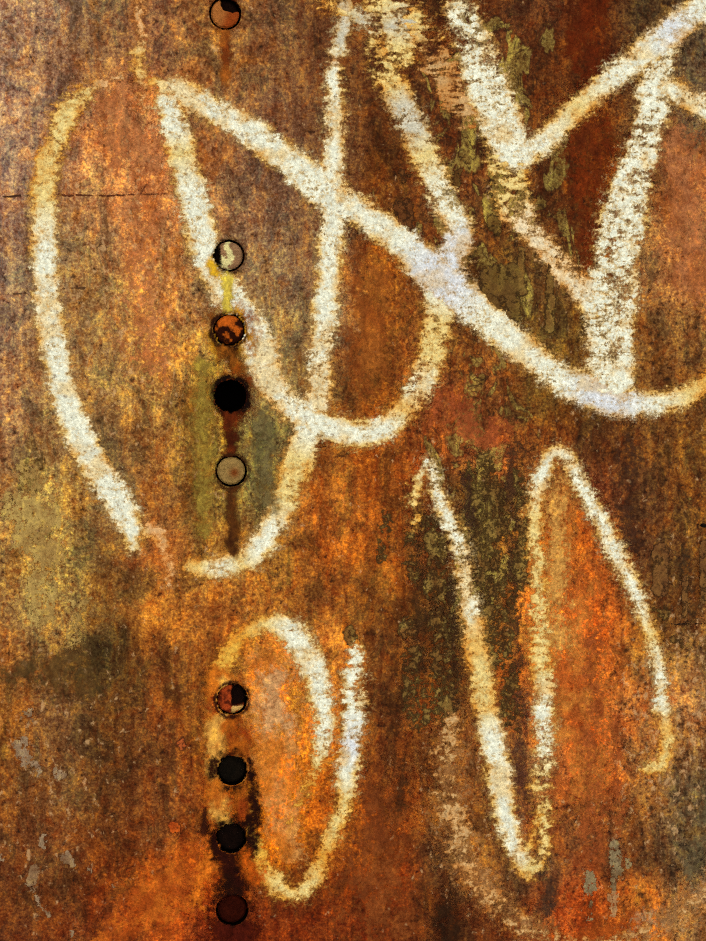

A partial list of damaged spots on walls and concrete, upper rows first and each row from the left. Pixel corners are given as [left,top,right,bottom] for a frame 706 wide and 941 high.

corrosion [212,0,245,87]
corrosion [557,0,611,109]
corrosion [90,81,179,387]
corrosion [557,99,618,272]
corrosion [651,118,706,312]
corrosion [190,238,280,557]
corrosion [336,248,401,402]
corrosion [530,477,629,877]
corrosion [90,644,311,941]
corrosion [332,774,425,941]
corrosion [537,894,642,941]